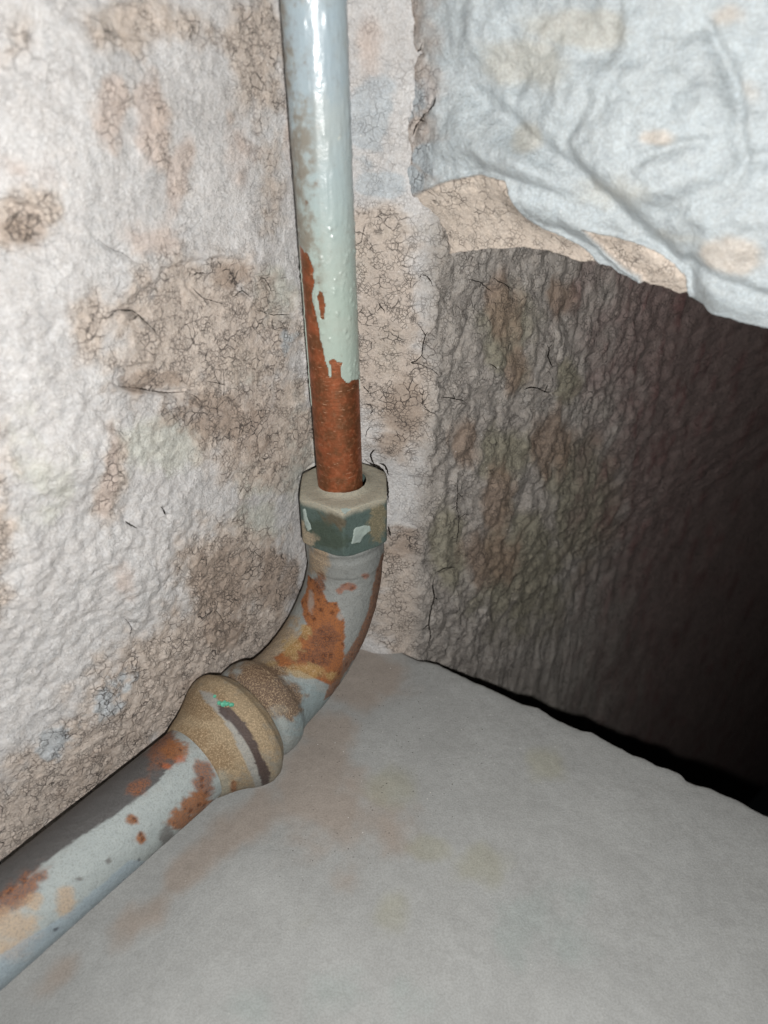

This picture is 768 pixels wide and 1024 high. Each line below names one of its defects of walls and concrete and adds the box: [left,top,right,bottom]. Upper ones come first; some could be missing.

crack [99,309,158,337]
crack [112,361,228,402]
crack [191,271,287,330]
crack [411,321,463,413]
crack [363,386,389,500]
crack [422,472,467,645]